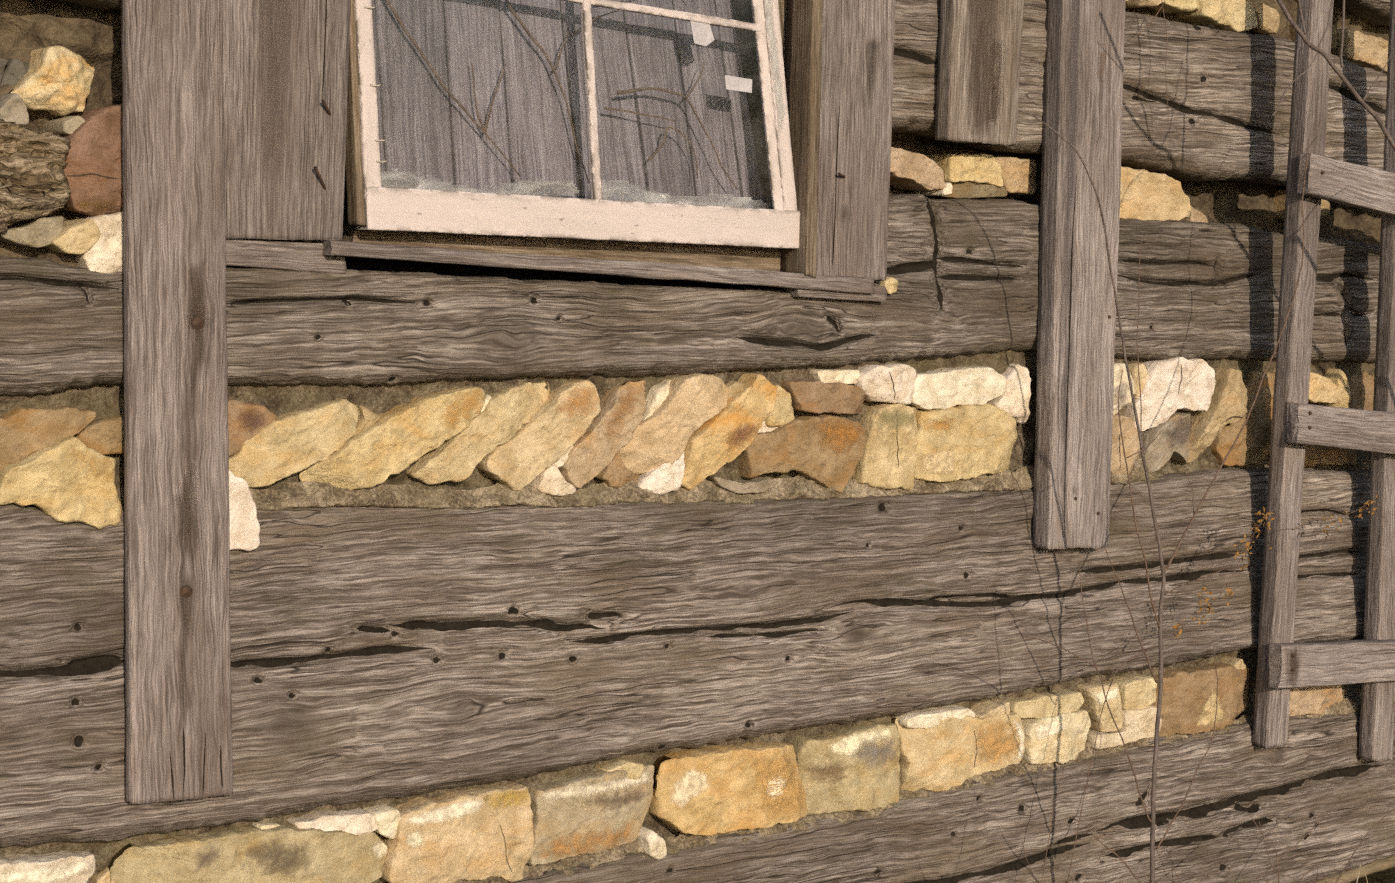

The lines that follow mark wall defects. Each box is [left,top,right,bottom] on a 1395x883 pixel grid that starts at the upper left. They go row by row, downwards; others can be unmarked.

crack [170,727,223,799]